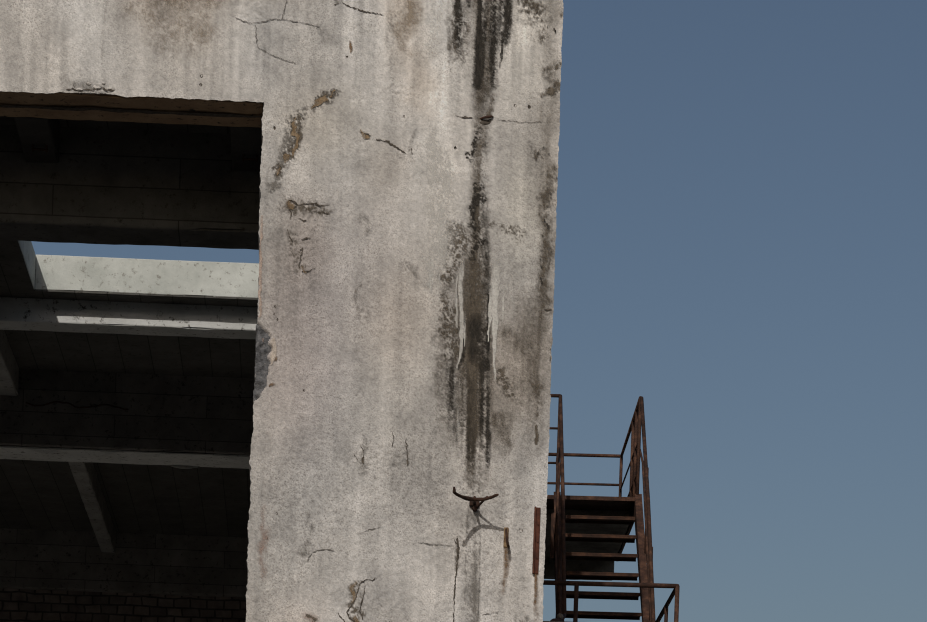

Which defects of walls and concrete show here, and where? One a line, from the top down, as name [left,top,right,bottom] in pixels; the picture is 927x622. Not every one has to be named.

crack [237,0,319,64]
spalling [311,90,335,109]
spalling [276,118,300,175]
water stain [427,0,556,482]
spalling [253,222,276,401]